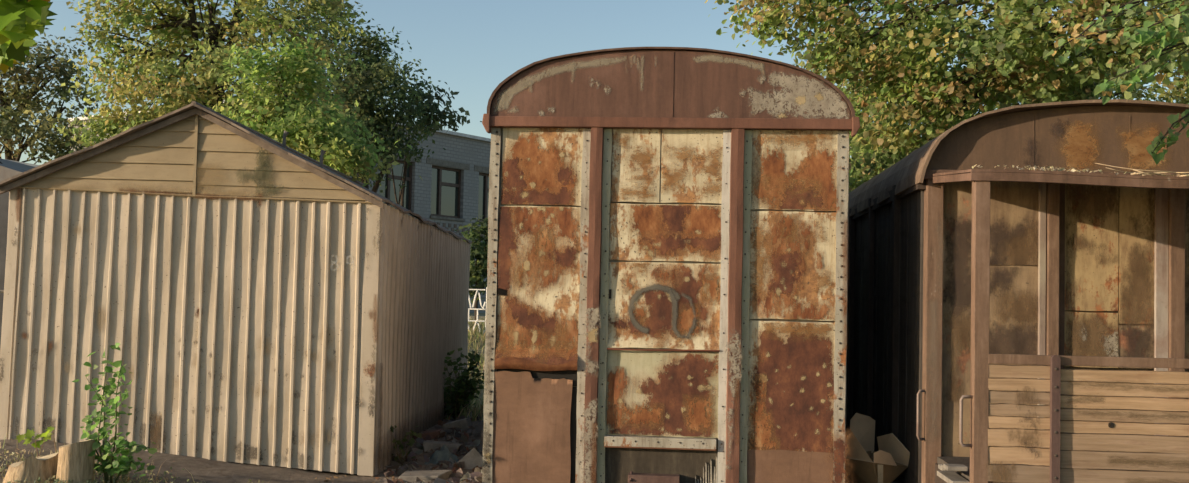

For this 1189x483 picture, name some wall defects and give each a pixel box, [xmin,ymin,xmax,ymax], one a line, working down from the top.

rust [494,132,578,367]
rust [607,135,722,437]
peeling [740,72,849,119]
rust [748,131,849,483]
damp [1067,184,1119,224]
damp [1120,189,1155,358]